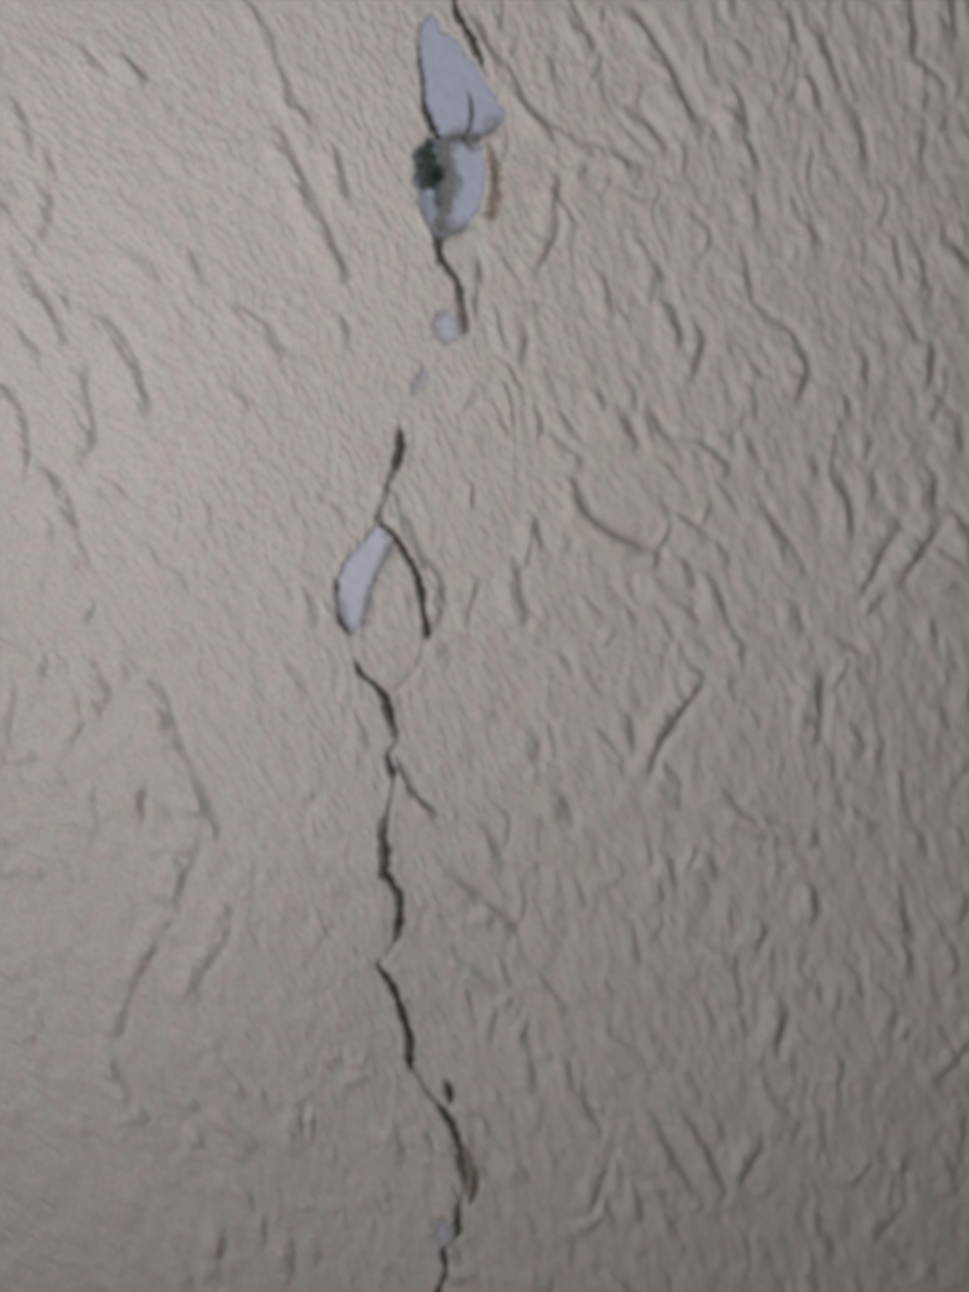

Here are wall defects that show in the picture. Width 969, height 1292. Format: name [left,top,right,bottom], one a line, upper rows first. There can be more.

crack [419,0,483,139]
spalling [414,14,506,244]
crack [435,237,467,331]
crack [391,429,404,476]
spalling [320,526,393,635]
crack [378,511,431,638]
crack [335,582,397,782]
crack [377,816,414,1069]
crack [437,1083,476,1292]